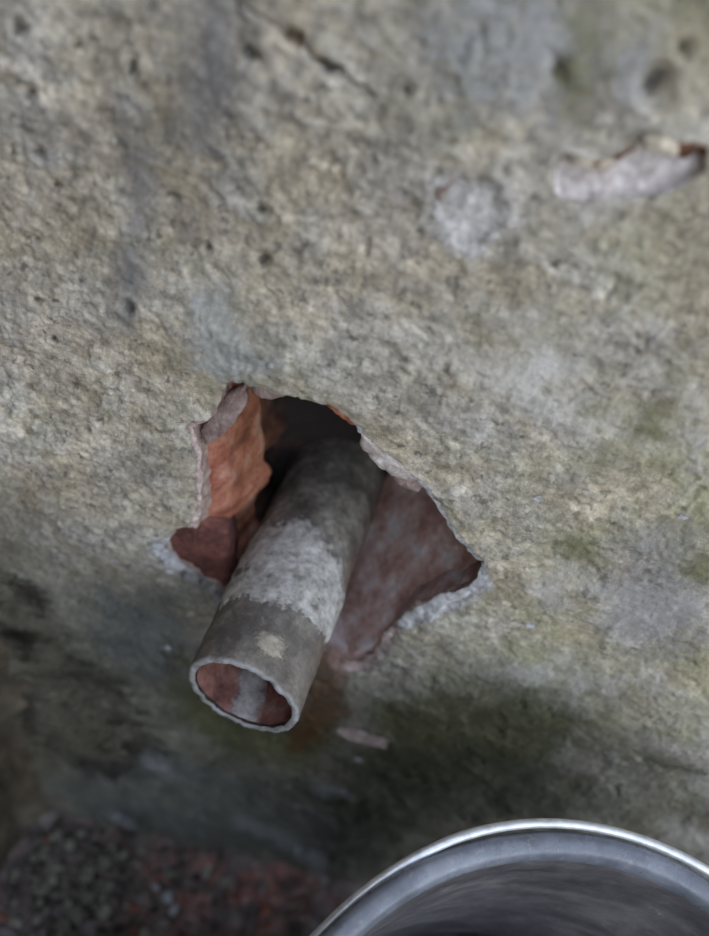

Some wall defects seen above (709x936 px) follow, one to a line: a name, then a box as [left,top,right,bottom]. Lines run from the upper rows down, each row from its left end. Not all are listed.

crack [236,0,384,109]
spalling [554,128,708,202]
spalling [150,381,494,677]
water stain [0,573,391,875]
rust [294,651,341,748]